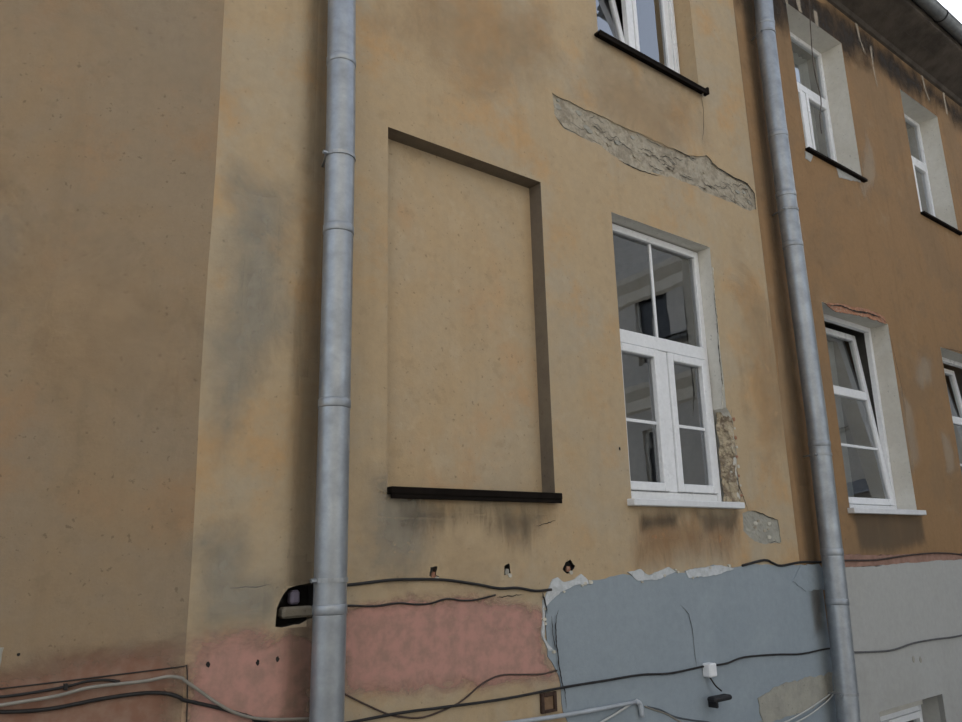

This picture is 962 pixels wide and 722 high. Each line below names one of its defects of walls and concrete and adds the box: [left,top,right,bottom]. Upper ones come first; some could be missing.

water stain [773,0,962,123]
flaking render [552,93,756,211]
peeling [541,560,593,653]
peeling [627,564,734,583]
flaking render [742,510,781,544]